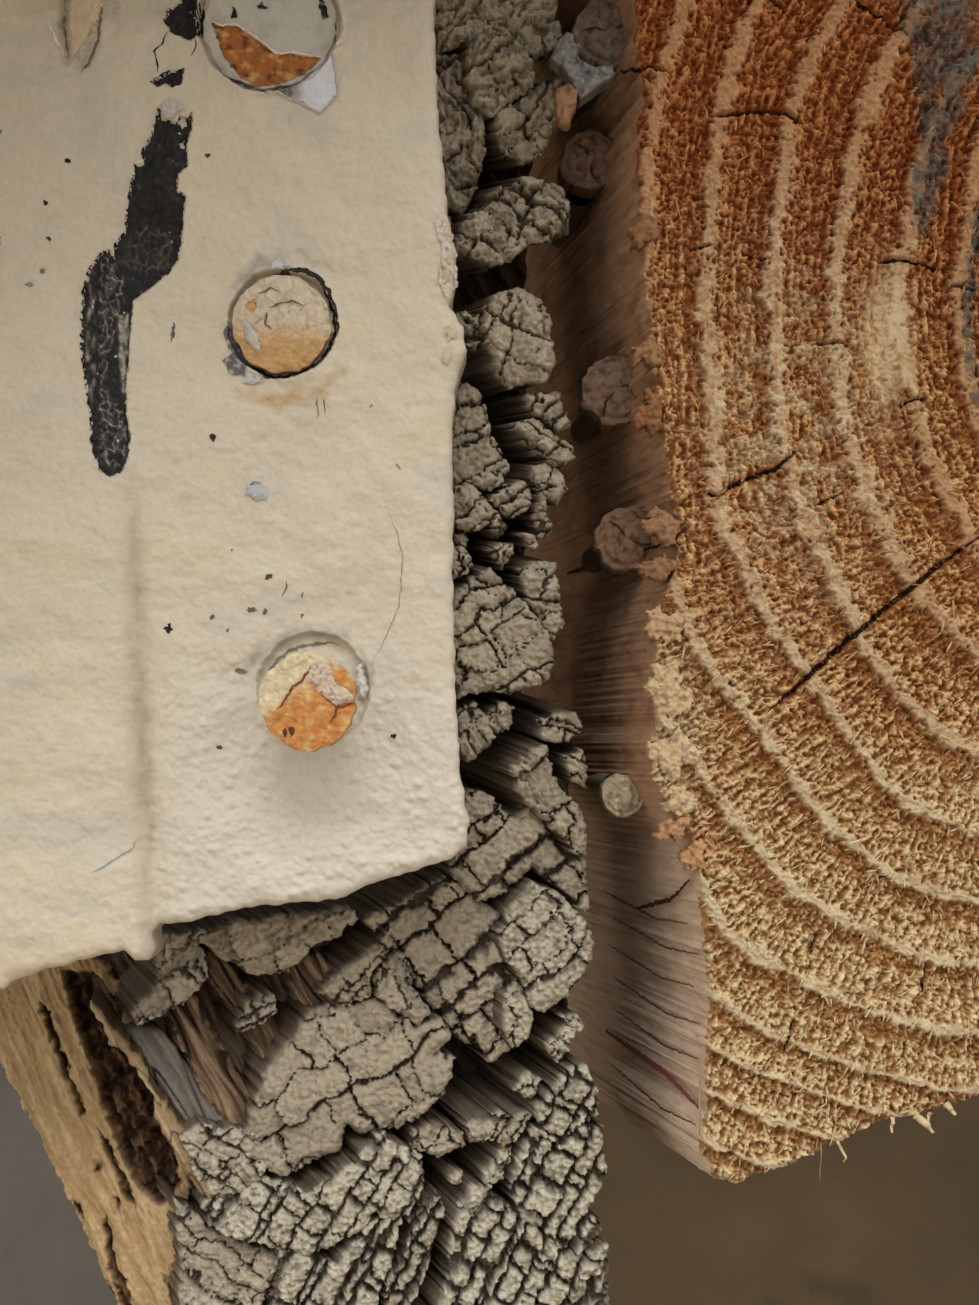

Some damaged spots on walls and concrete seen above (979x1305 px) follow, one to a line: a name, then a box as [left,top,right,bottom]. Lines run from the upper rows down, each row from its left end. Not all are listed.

corrosion [211,22,321,87]
peeling [223,0,347,113]
peeling [80,0,205,477]
peeling [241,318,261,352]